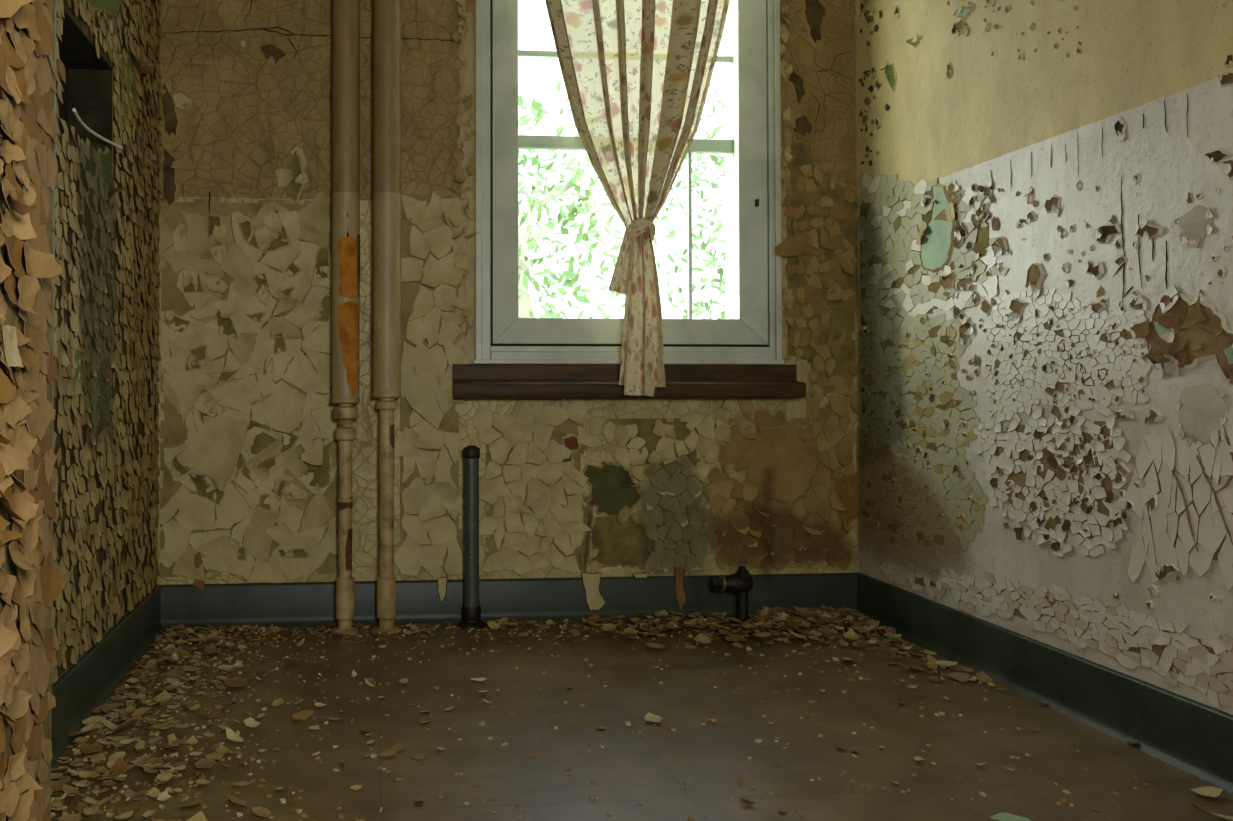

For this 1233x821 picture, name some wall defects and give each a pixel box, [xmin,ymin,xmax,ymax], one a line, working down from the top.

crack [1143,94,1189,138]
corrosion [337,234,359,398]
peeling [389,0,1233,707]
crack [980,127,1168,418]
crack [1125,408,1233,592]